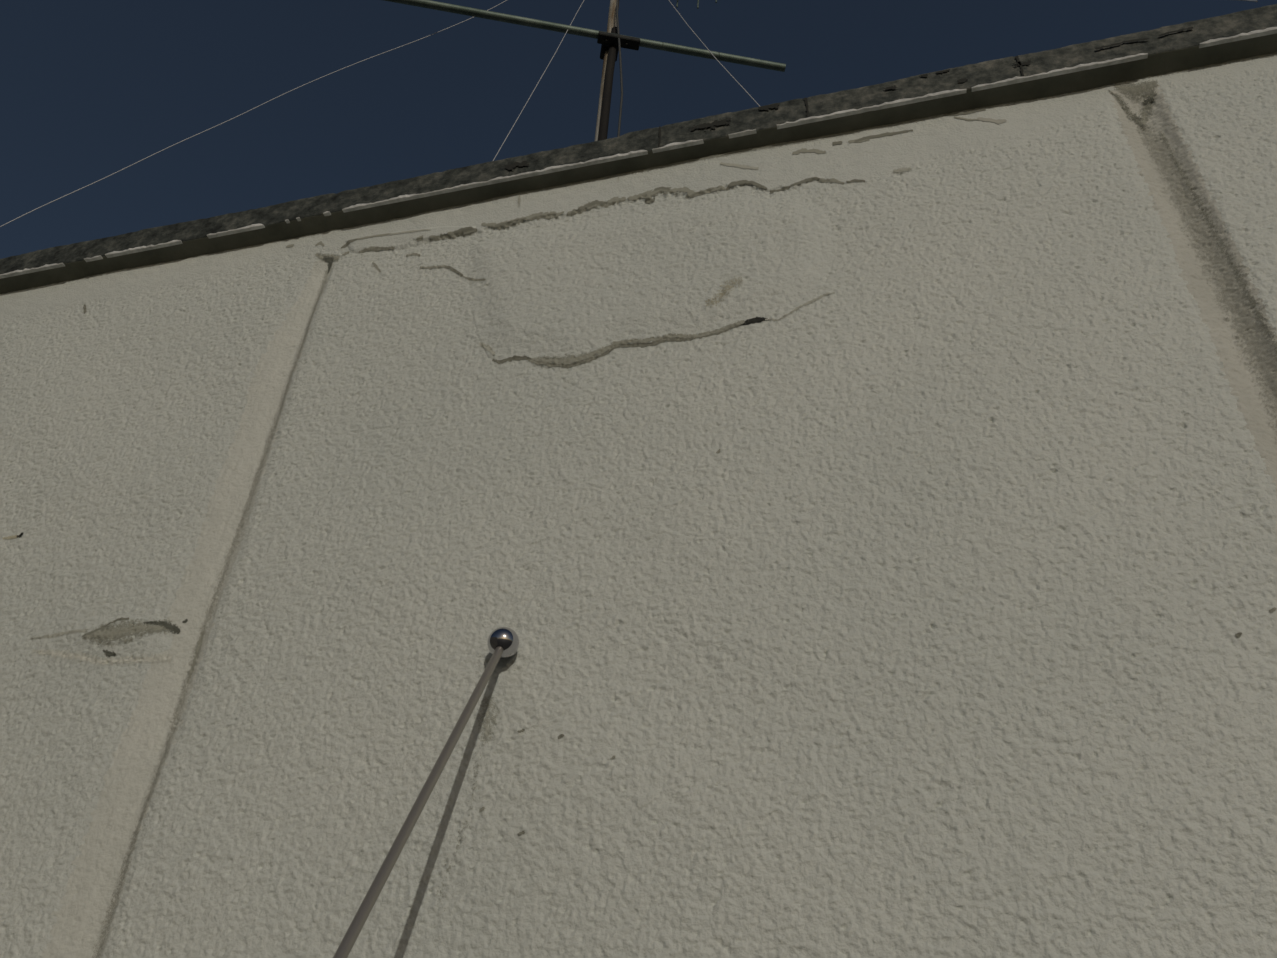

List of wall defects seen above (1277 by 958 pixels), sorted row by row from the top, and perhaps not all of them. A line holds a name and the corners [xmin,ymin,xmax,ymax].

crack [954,116,1007,124]
crack [286,129,913,281]
leakage [1111,80,1277,444]
crack [479,292,835,368]
spalling [82,619,188,658]